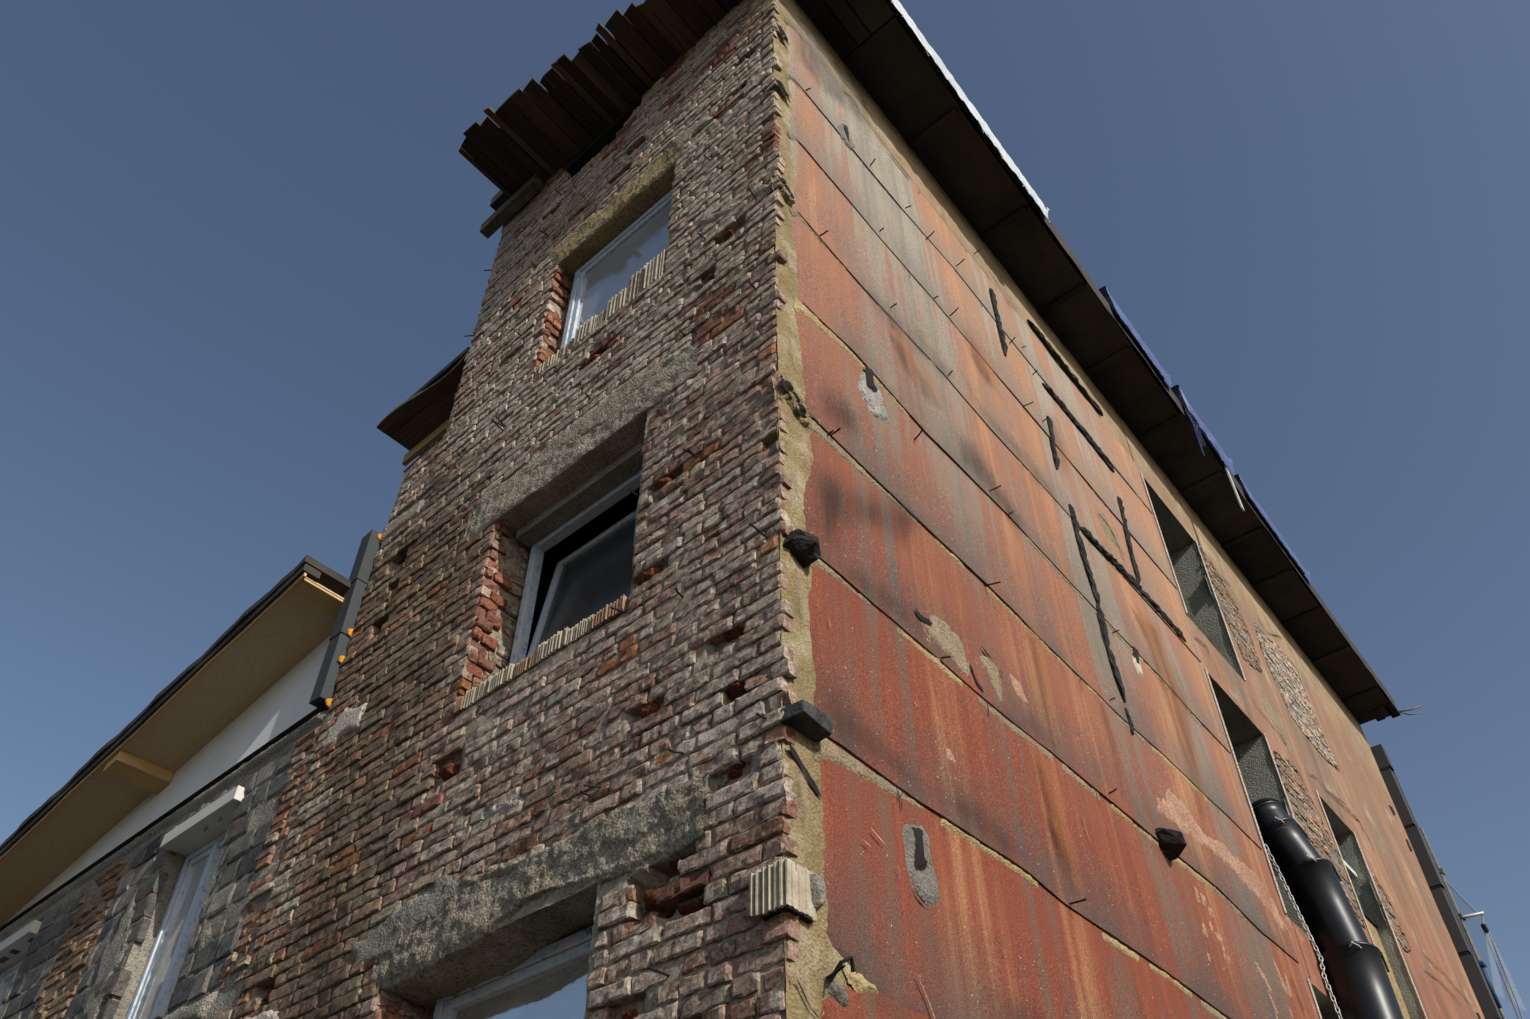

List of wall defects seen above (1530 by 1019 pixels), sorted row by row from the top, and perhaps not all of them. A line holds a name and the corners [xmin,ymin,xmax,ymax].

spalling [858,366,889,424]
peeling [915,609,1028,703]
spalling [643,857,708,917]
spalling [902,824,941,906]
peeling [1156,789,1292,939]